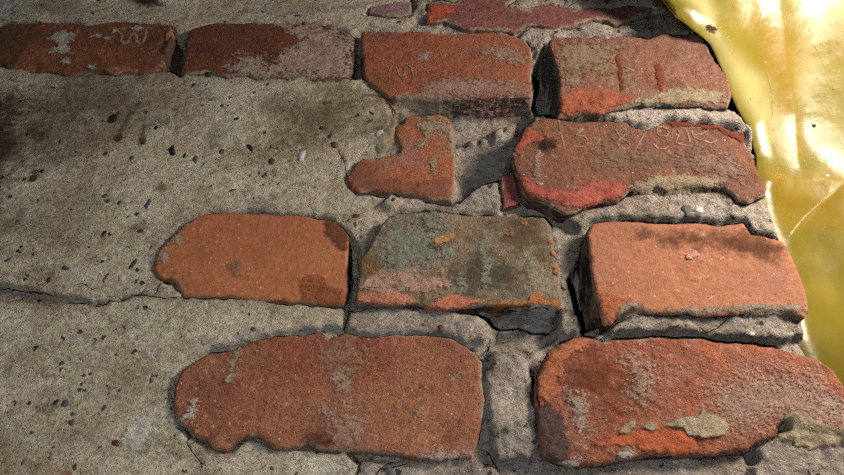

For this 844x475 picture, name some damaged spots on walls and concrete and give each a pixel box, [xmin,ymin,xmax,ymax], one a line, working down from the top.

crack [0,288,53,297]
crack [76,283,217,307]